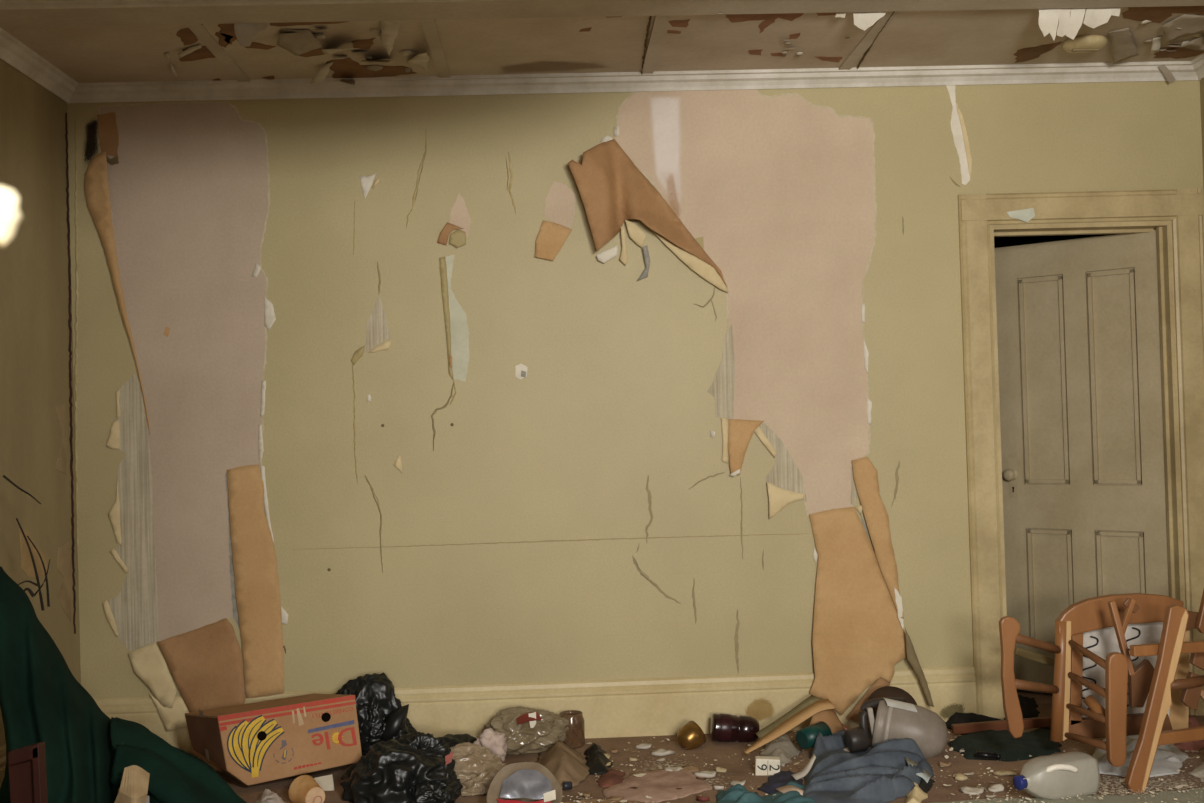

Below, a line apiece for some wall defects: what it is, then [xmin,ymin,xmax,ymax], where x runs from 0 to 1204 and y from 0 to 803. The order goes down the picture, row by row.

peeling [163,20,429,86]
peeling [1013,6,1204,83]
peeling [946,85,972,187]
peeling [437,193,472,248]
peeling [535,181,575,261]
flaking render [596,89,875,519]
flaking render [100,102,276,641]
crack [292,472,811,624]